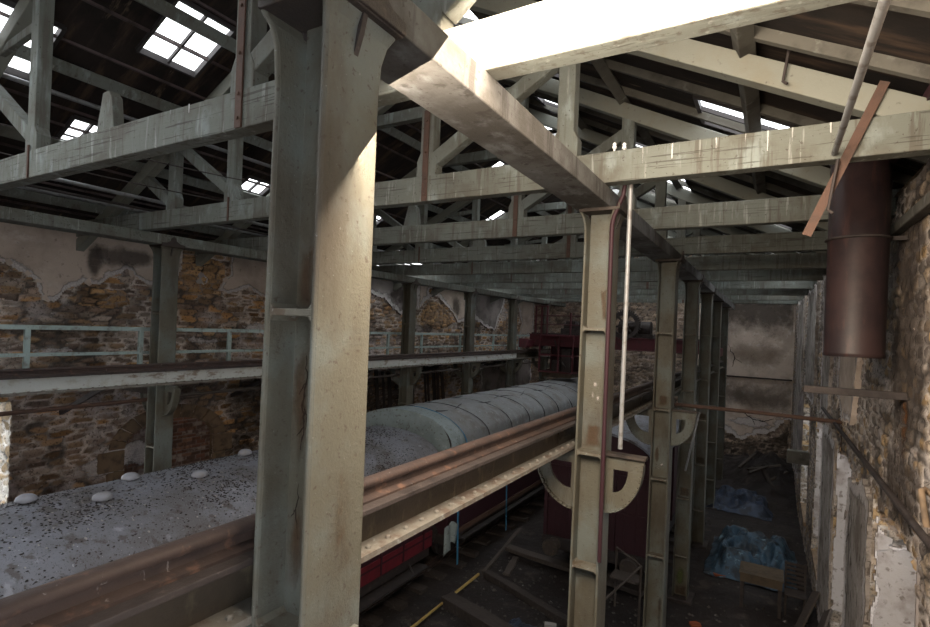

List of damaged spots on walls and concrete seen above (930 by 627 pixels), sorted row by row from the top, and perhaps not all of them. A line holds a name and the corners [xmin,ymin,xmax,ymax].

peeling [0,222,153,302]
water stain [88,246,150,273]
peeling [218,257,267,297]
peeling [371,279,403,315]
peeling [416,286,506,330]
peeling [517,302,535,337]
crack [297,355,308,450]
peeling [724,275,916,627]